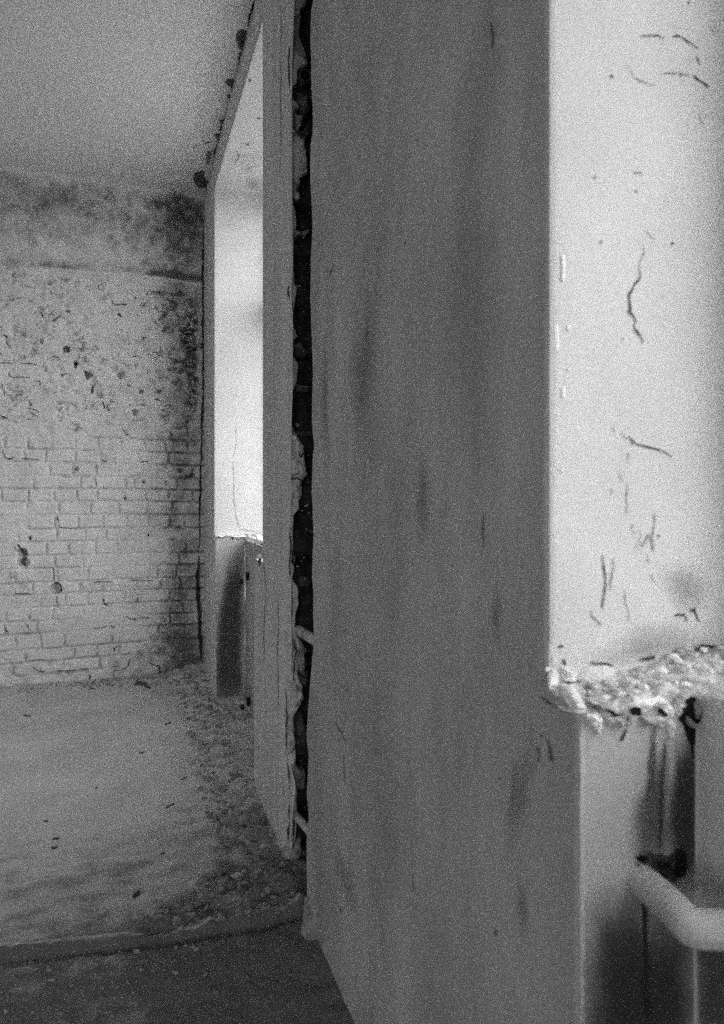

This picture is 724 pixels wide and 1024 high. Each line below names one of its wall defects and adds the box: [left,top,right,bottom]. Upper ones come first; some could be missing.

crack [630,34,710,123]
crack [627,232,655,342]
damp [181,314,196,405]
crack [591,427,672,626]
flaking render [544,665,617,735]
spalling [638,693,702,755]
damp [642,726,696,868]